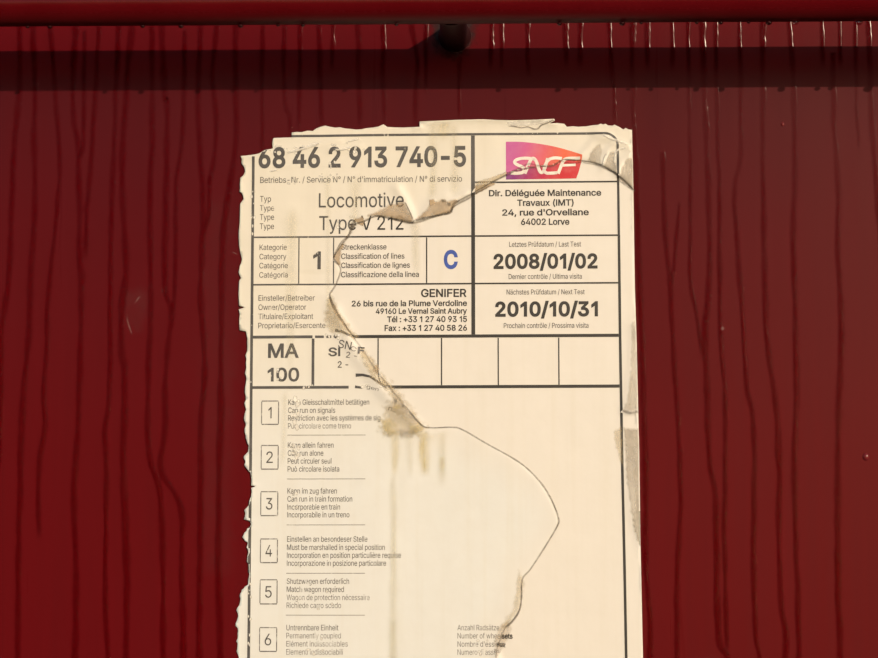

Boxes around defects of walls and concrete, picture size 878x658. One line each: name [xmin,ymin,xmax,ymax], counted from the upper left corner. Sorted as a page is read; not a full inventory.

leakage [16,204,37,658]
leakage [36,143,61,530]
leakage [71,117,94,658]
leakage [103,138,129,658]
leakage [145,145,213,658]
leakage [216,172,232,658]
leakage [625,263,652,658]
leakage [664,231,683,658]
leakage [688,235,729,658]
leakage [737,258,762,658]
leakage [763,229,801,658]
leakage [835,215,844,658]